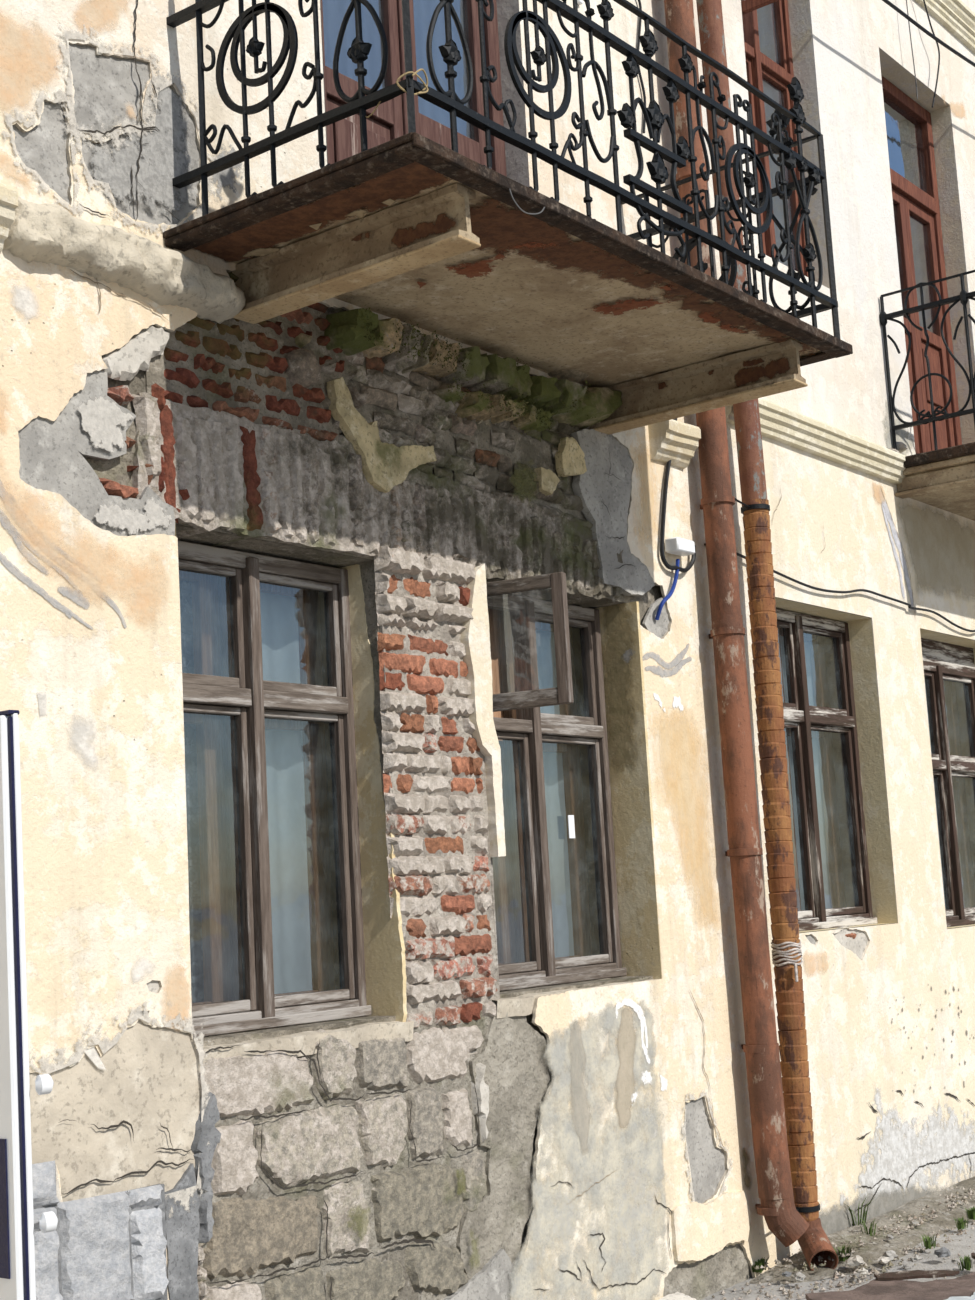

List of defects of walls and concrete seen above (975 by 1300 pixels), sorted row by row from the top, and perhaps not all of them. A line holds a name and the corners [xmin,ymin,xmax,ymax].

flaking render [2,24,217,237]
crack [78,0,177,220]
flaking render [642,596,669,639]
flaking render [18,303,623,1300]
crack [58,1119,194,1194]
crack [550,1171,615,1204]
crack [533,1193,672,1291]
flaking render [663,1091,752,1300]
crack [856,1152,975,1211]